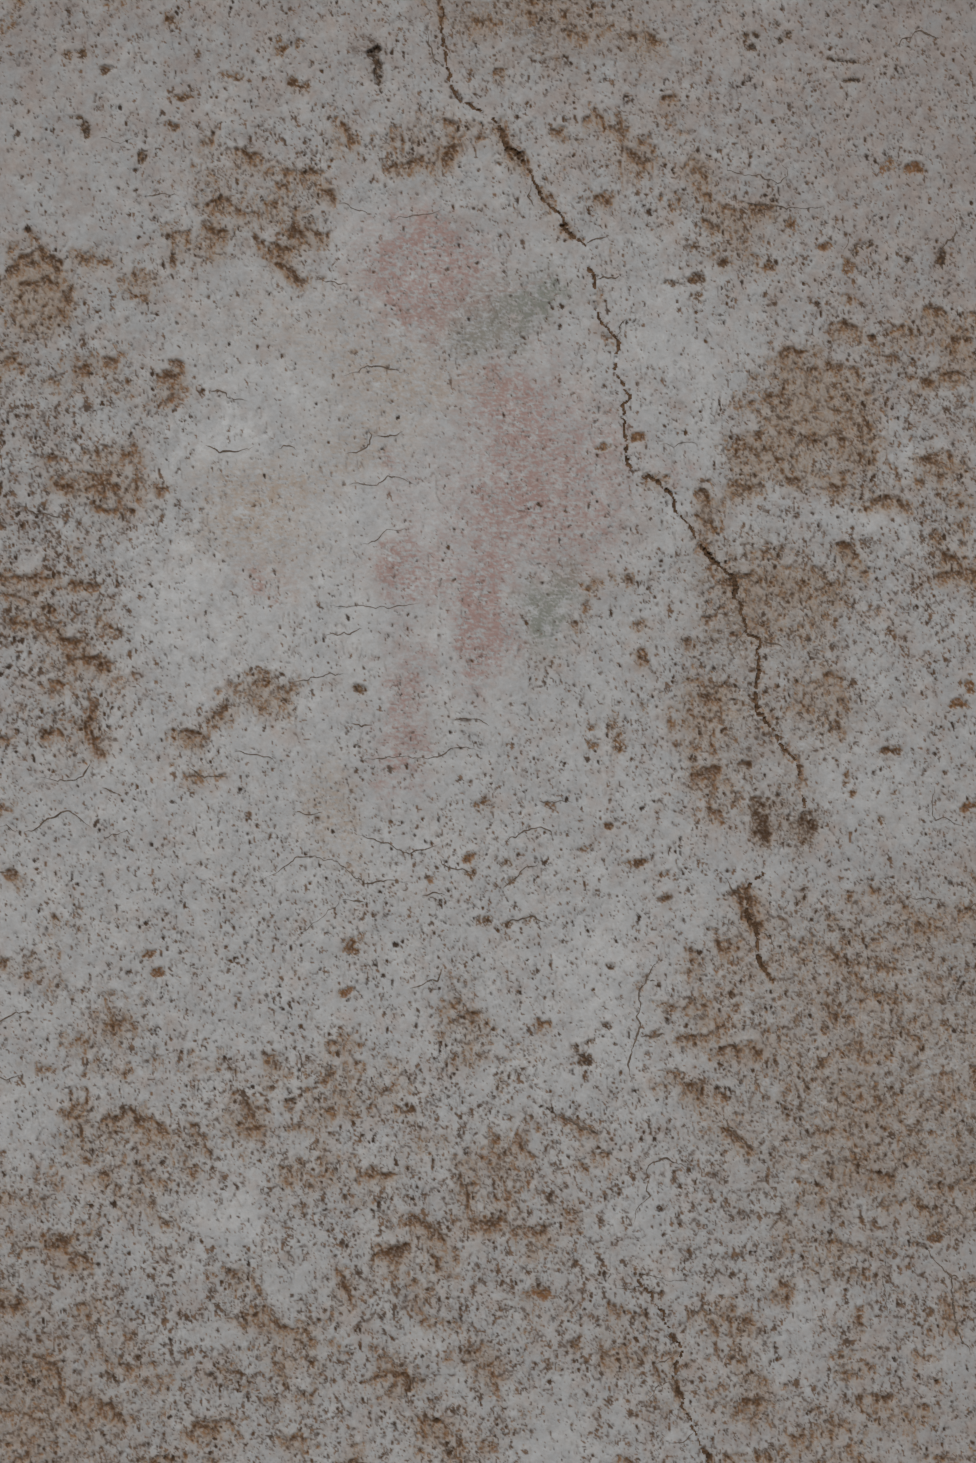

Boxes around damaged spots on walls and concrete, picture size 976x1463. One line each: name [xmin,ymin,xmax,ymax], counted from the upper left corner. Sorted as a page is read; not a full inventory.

spalling [0,106,468,413]
crack [727,157,824,210]
spalling [39,424,176,520]
crack [427,6,809,808]
spalling [689,240,976,610]
spalling [0,544,137,780]
spalling [164,667,310,791]
crack [503,800,570,924]
spalling [639,637,825,865]
crack [709,871,780,989]
spalling [735,534,902,751]
spalling [0,865,976,1463]